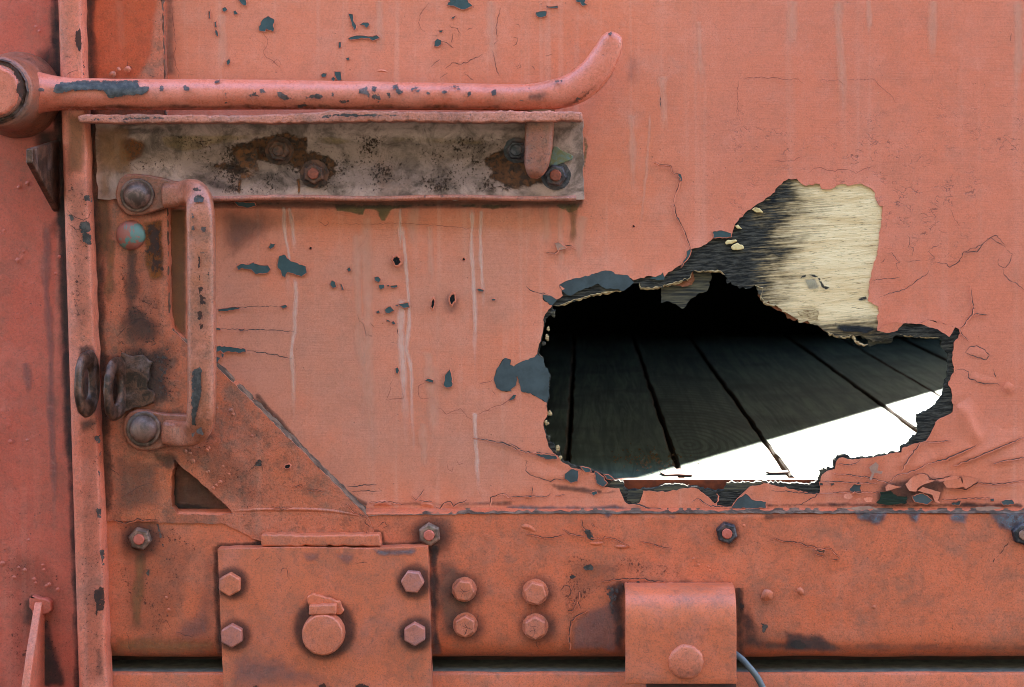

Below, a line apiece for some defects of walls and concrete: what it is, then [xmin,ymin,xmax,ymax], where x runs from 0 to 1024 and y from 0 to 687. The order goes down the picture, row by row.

peeling [447,0,473,19]
peeling [38,29,164,98]
peeling [249,13,471,118]
rust [214,132,336,193]
rust [484,149,543,189]
peeling [236,243,307,278]
crack [876,203,1022,296]
peeling [543,270,634,305]
peeling [919,320,955,337]
crack [955,286,999,385]
peeling [494,354,551,402]
peeling [844,462,979,510]